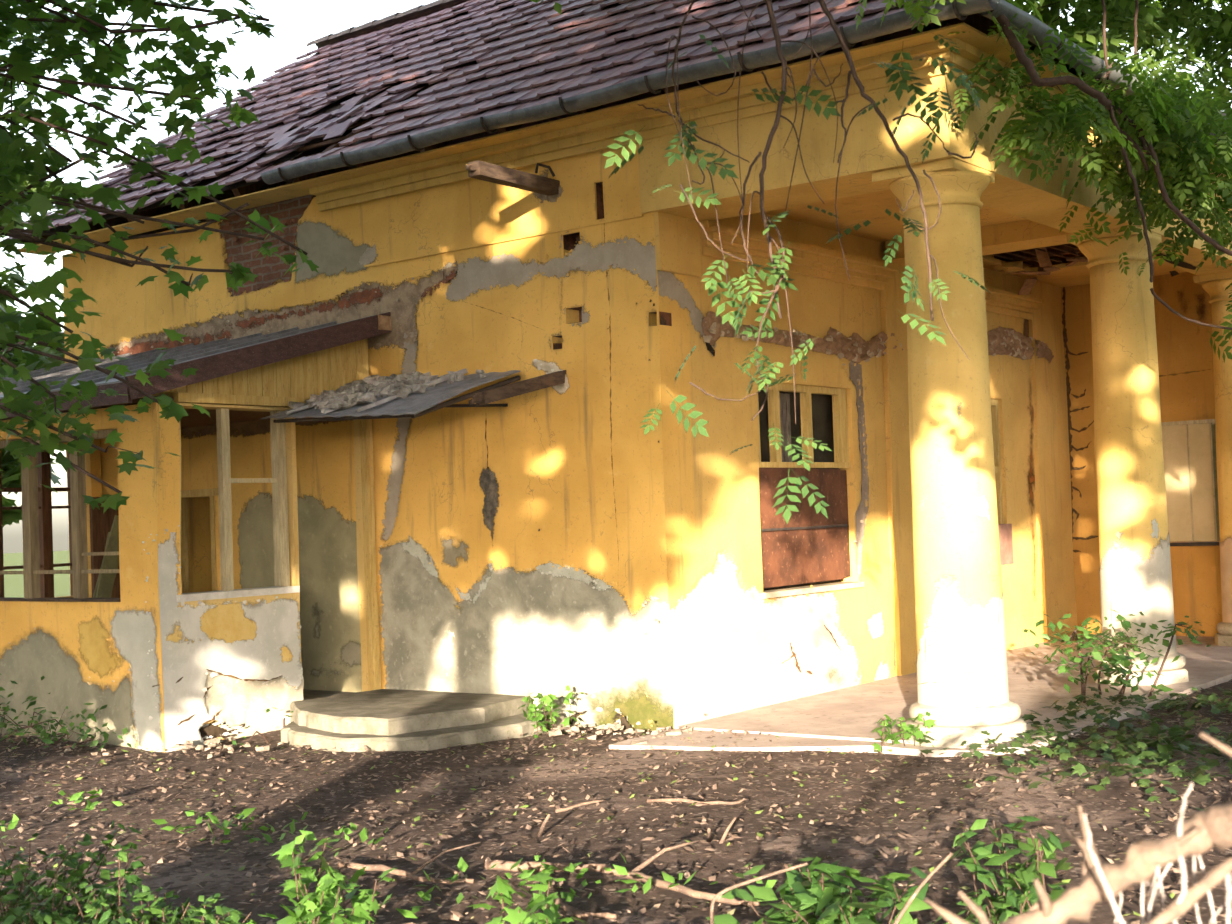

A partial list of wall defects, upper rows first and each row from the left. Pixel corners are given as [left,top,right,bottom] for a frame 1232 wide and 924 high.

flaking render [103,182,459,374]
flaking render [533,304,590,394]
spalling [560,232,584,257]
spalling [636,300,672,326]
peeling [142,525,304,752]
flaking render [377,417,892,731]
flaking render [916,575,1009,707]
flaking render [1099,519,1177,656]
flaking render [1219,537,1232,623]